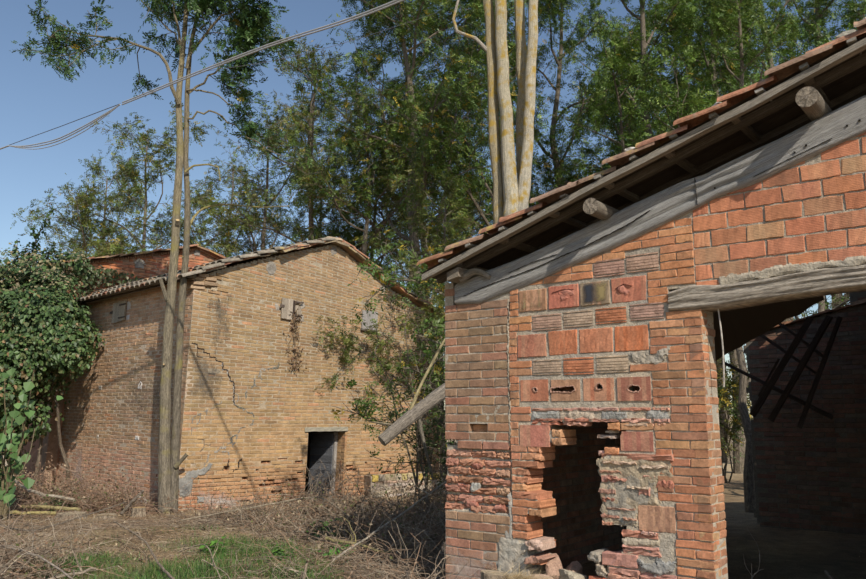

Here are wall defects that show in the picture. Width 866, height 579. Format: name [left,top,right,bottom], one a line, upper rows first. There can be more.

crack [191,343,279,472]
spalling [597,430,622,439]
spalling [444,449,512,514]
spalling [524,536,557,564]
spalling [587,548,610,576]